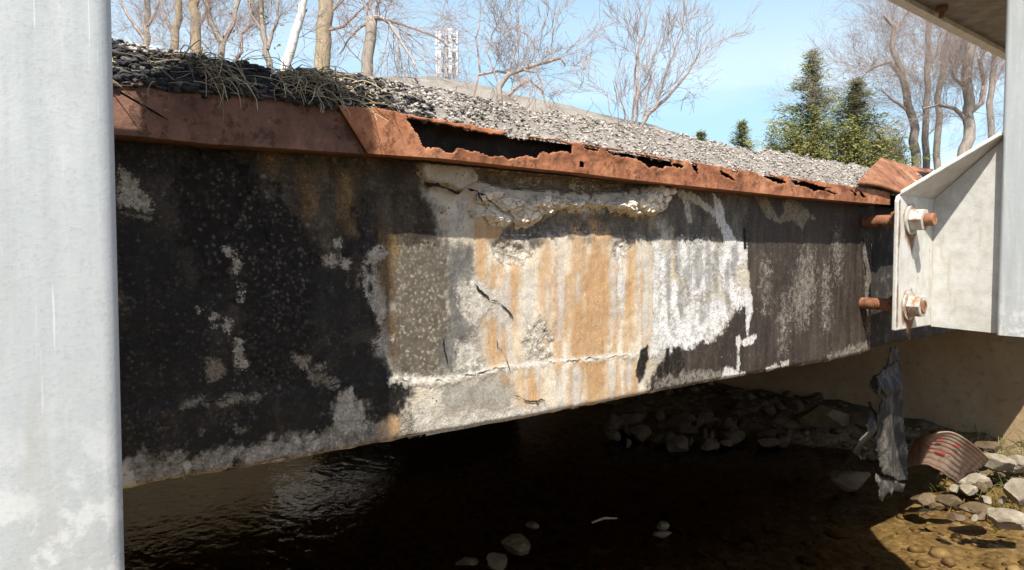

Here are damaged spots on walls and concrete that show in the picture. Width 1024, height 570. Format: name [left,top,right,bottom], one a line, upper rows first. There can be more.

spalling [472,167,677,267]
rust [376,233,398,354]
leakage [114,140,874,471]
crack [476,285,514,319]
rust [477,219,654,416]